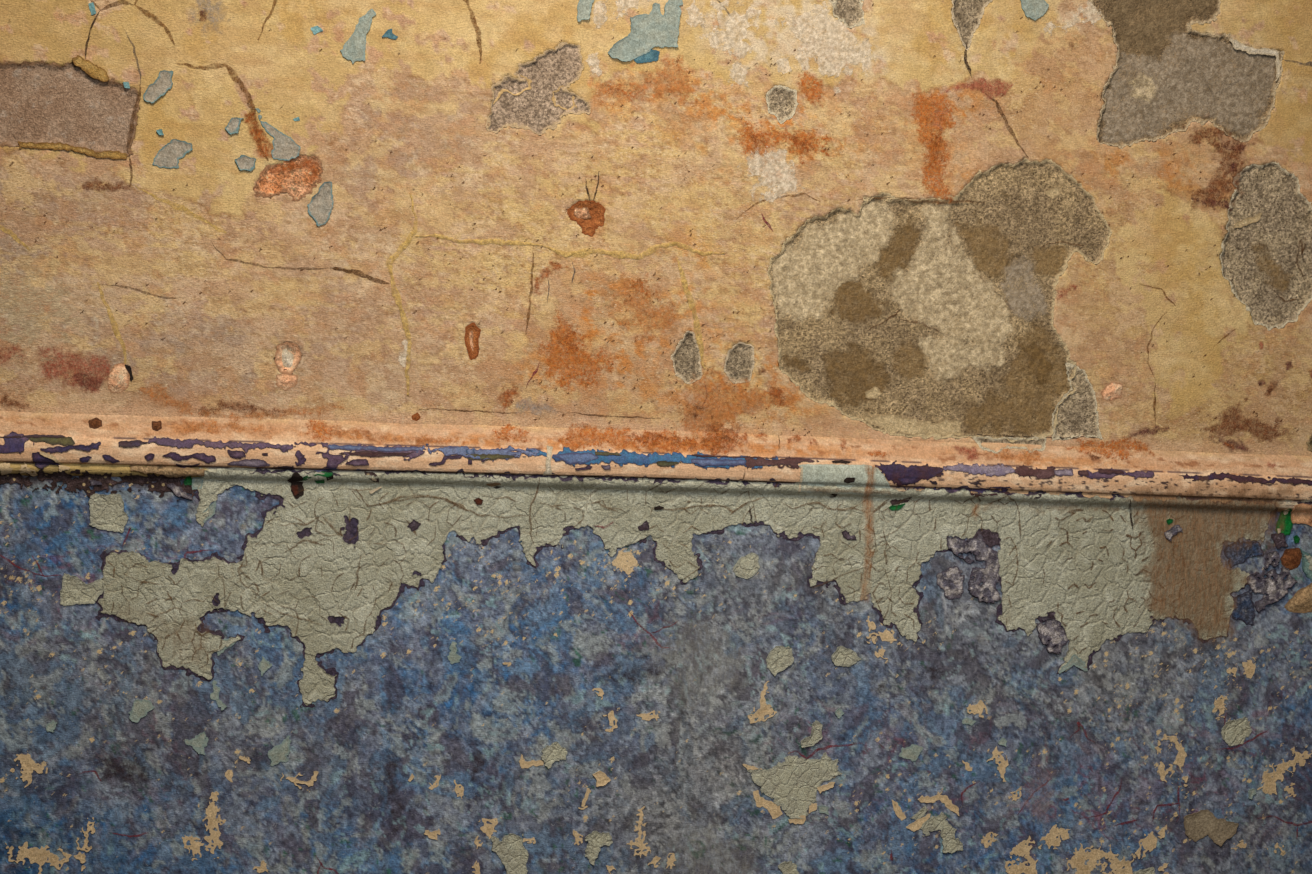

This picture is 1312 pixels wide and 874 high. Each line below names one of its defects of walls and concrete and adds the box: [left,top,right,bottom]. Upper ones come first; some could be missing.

spalling [0,55,173,159]
crack [85,0,724,414]
corrosion [741,121,831,164]
corrosion [912,94,956,199]
spalling [1089,0,1285,149]
corrosion [1192,128,1246,211]
crack [557,411,661,419]
peeling [0,158,1312,710]
corrosion [558,368,791,455]
crack [0,555,58,577]
crack [108,470,1255,668]
peeling [1005,824,1169,874]